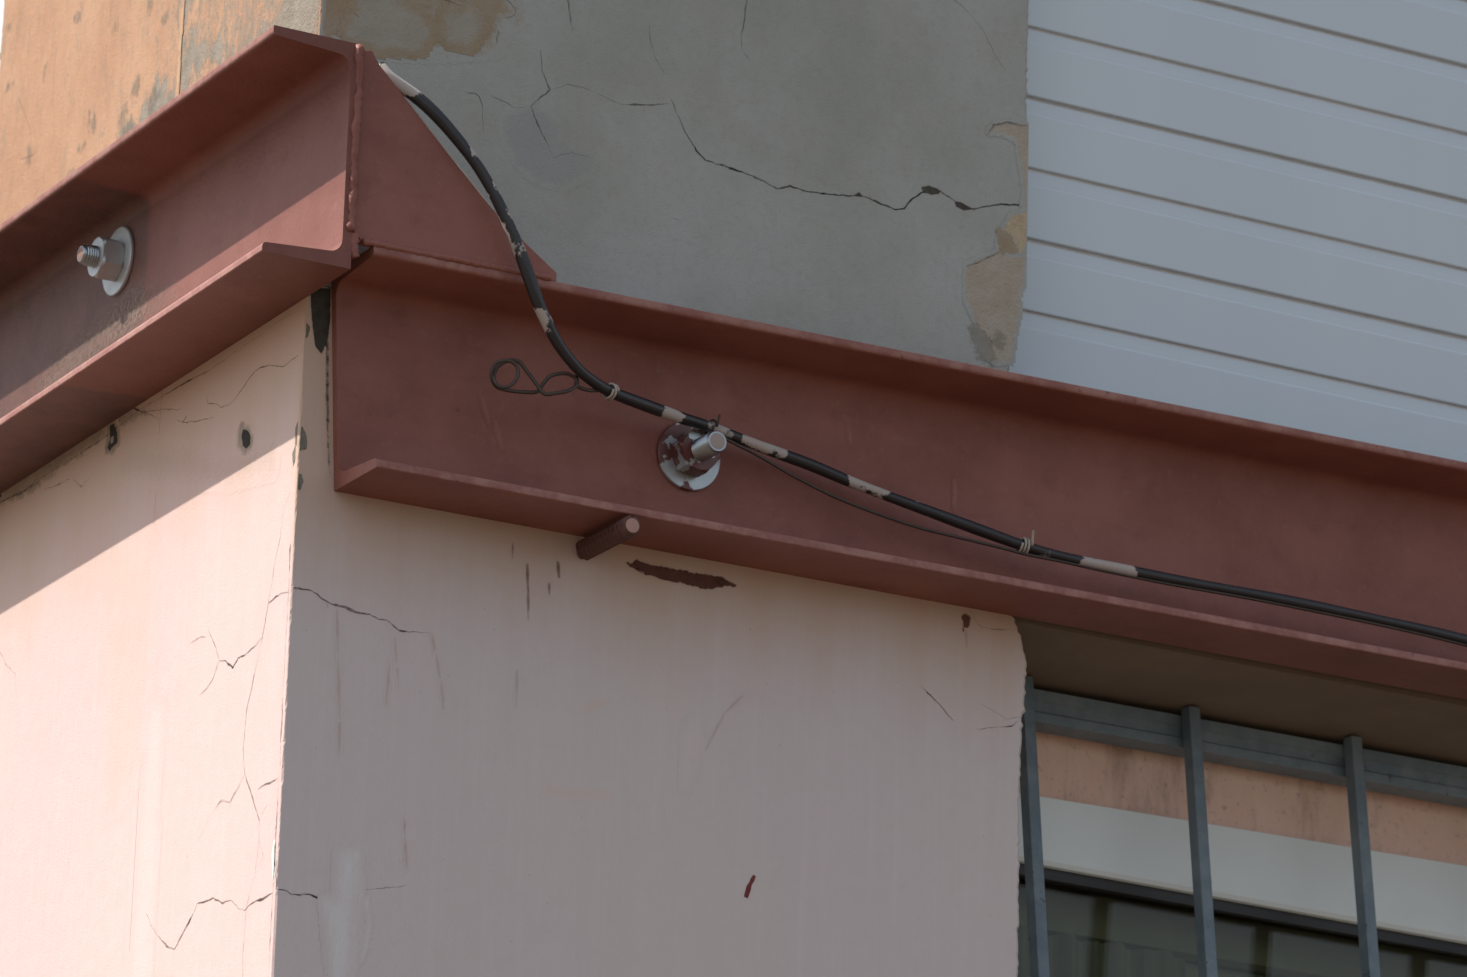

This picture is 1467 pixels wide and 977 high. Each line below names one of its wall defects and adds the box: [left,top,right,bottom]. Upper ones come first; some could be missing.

peeling [112,0,530,143]
crack [631,100,1019,210]
flaking render [962,118,1029,367]
crack [146,540,405,950]